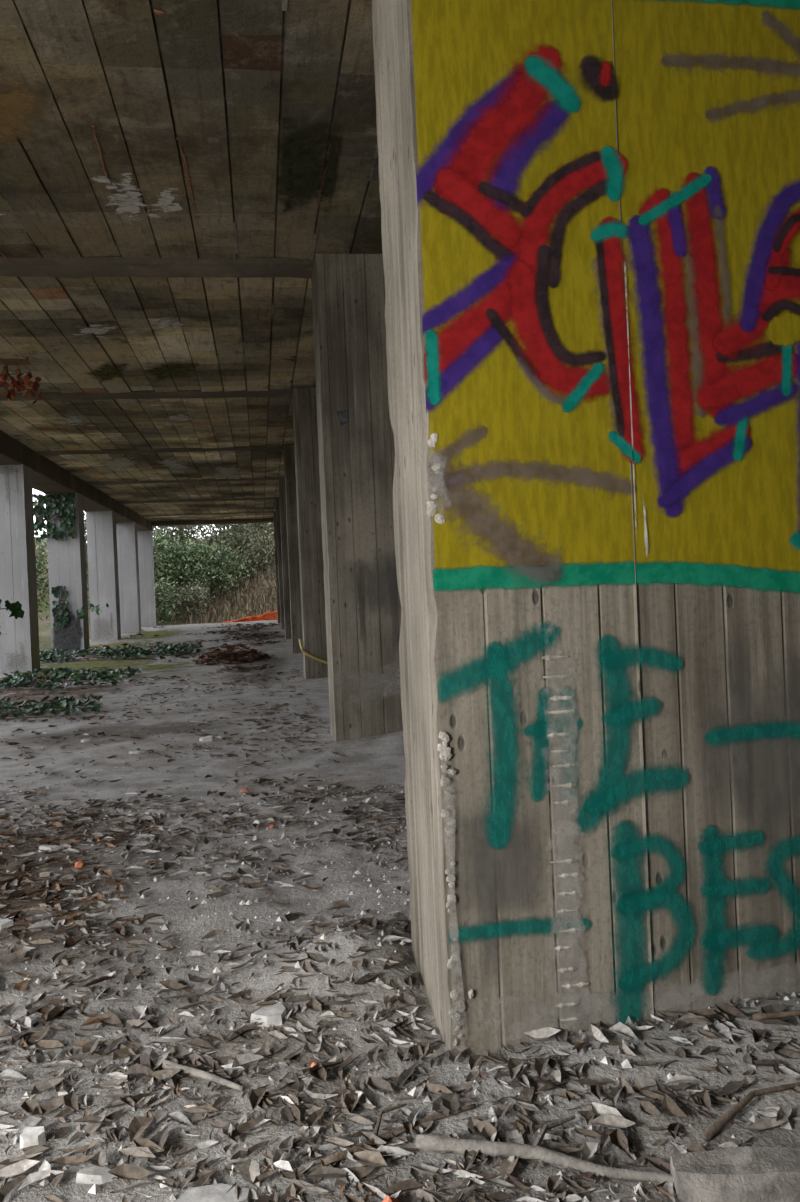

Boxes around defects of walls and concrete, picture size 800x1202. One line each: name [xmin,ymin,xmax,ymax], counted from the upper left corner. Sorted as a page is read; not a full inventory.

water stain [277,122,341,212]